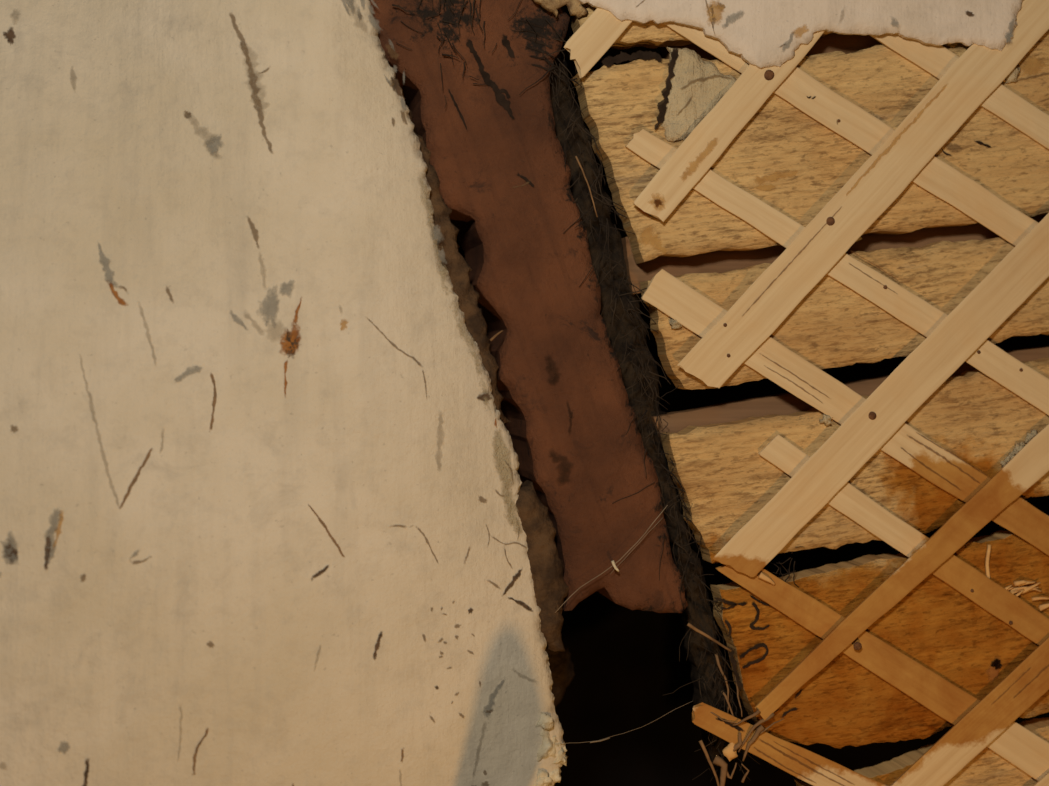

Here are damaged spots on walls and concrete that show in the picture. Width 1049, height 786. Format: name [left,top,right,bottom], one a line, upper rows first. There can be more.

spalling [342,0,381,29]
spalling [708,3,742,26]
spalling [780,26,808,50]
spalling [386,40,407,125]
corrosion [280,300,301,395]
spalling [479,419,522,532]
spalling [533,712,568,786]
peeling [722,743,738,762]